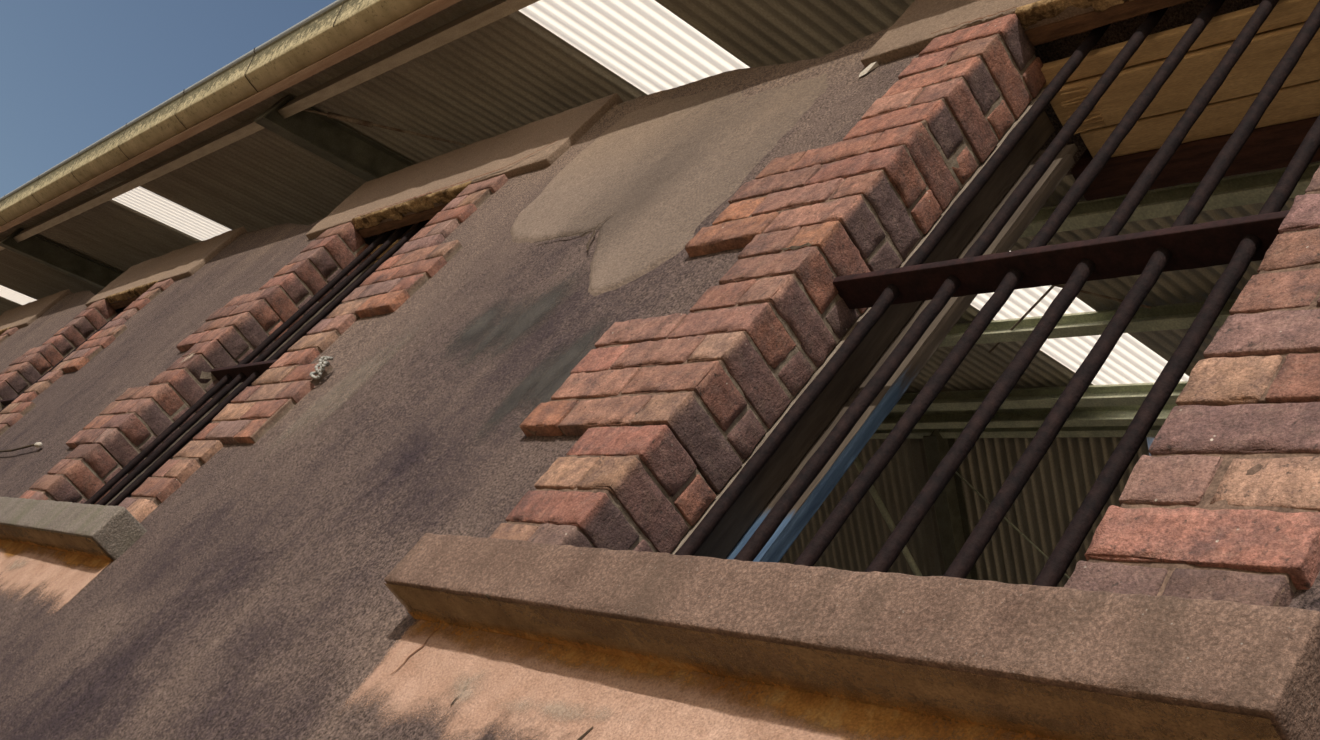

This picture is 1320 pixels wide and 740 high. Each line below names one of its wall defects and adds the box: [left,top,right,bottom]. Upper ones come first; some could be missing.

spalling [1015,0,1133,29]
spalling [352,181,472,229]